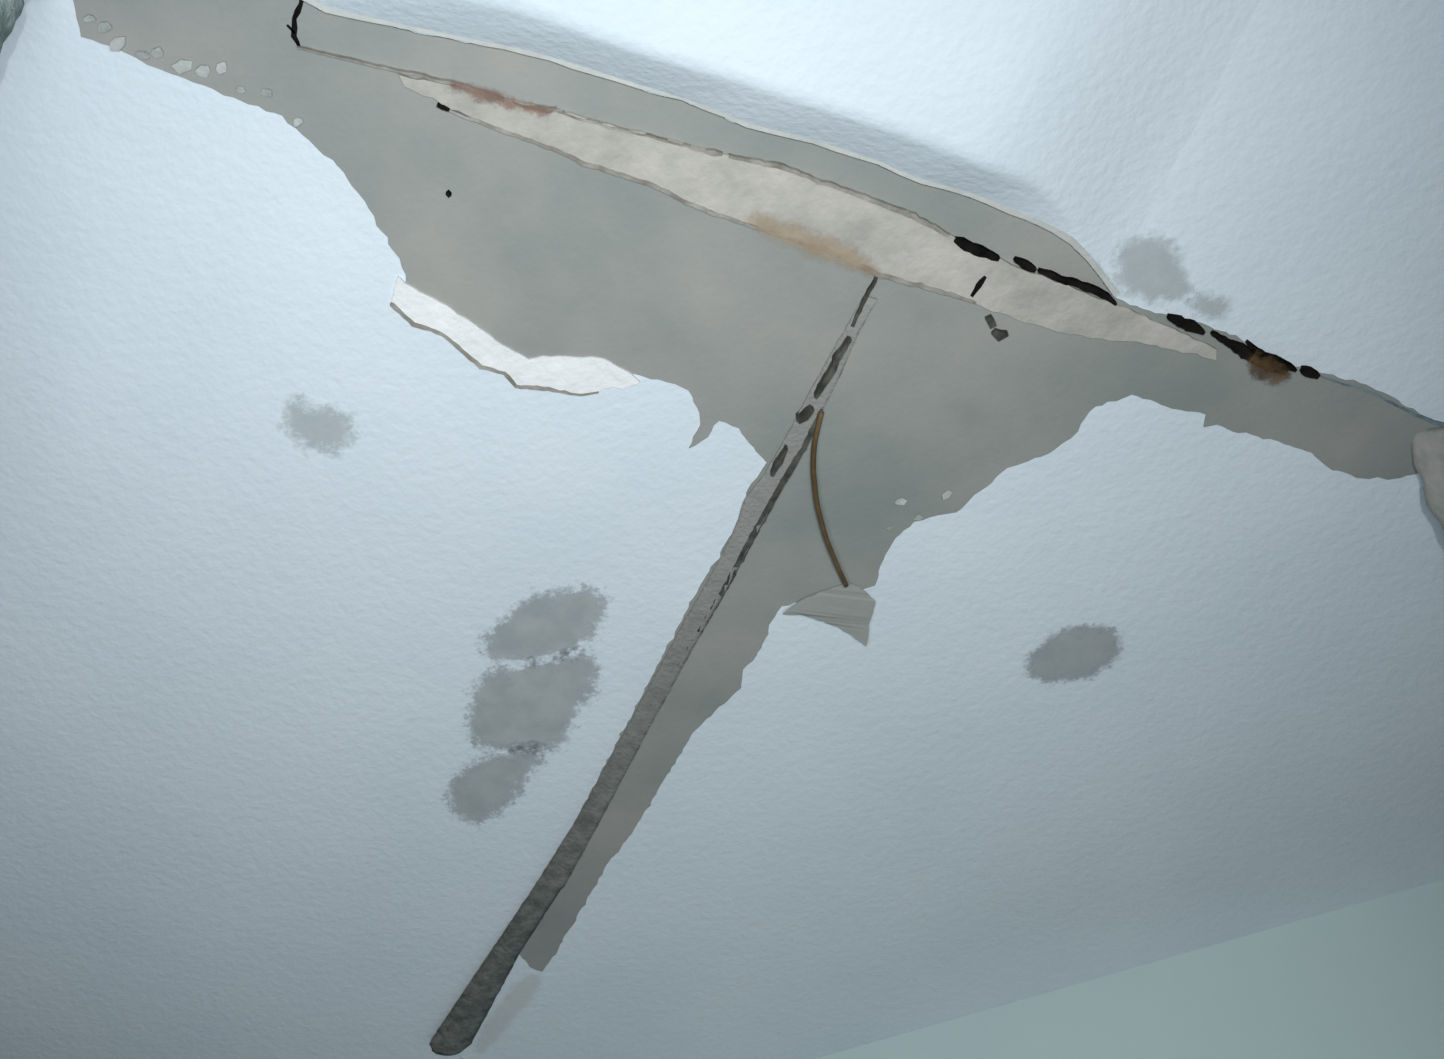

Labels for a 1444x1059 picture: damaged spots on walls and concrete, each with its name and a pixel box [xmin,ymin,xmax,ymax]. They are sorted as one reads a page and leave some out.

peeling [98,22,112,33]
peeling [151,47,163,58]
peeling [171,59,192,75]
peeling [195,65,210,78]
peeling [390,275,640,396]
peeling [985,314,997,329]
peeling [991,328,1009,342]
corrosion [1249,356,1291,384]
crack [1320,376,1444,427]
water stain [1027,626,1121,683]
peeling [571,520,738,828]
water stain [448,584,607,822]